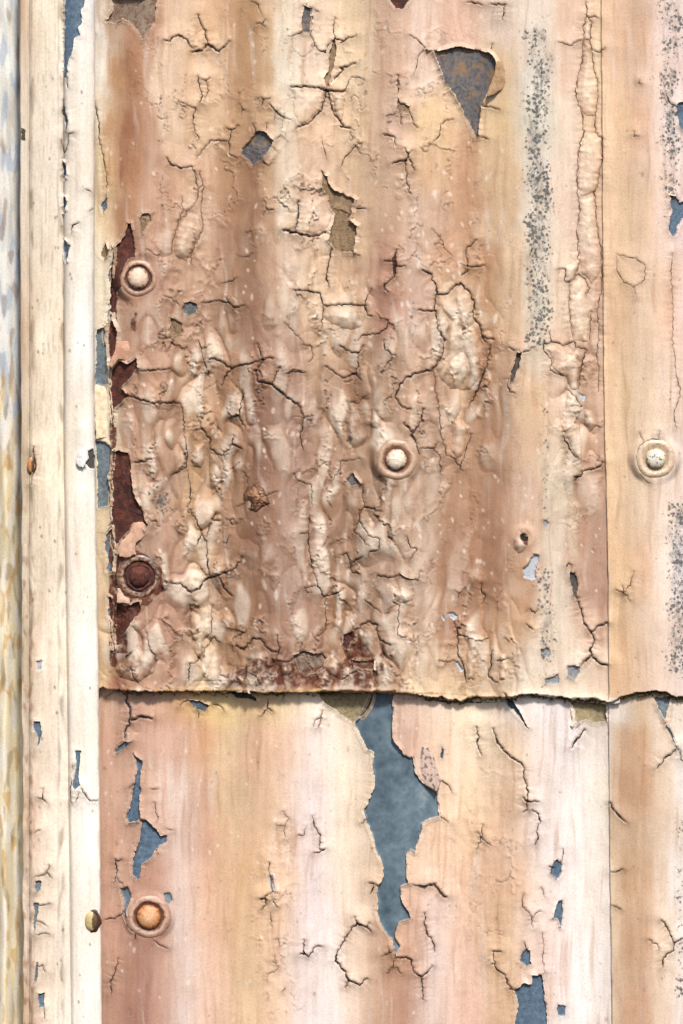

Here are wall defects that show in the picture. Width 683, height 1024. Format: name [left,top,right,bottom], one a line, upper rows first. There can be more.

peeling [60,0,90,78]
peeling [410,35,506,142]
mould [522,29,555,345]
mould [659,3,683,217]
corrosion [104,219,164,667]
crack [131,4,681,716]
corrosion [228,632,385,688]
mould [665,502,683,673]
peeling [317,691,451,961]
crack [476,730,541,844]
crack [260,863,446,999]
peeling [512,942,566,1024]